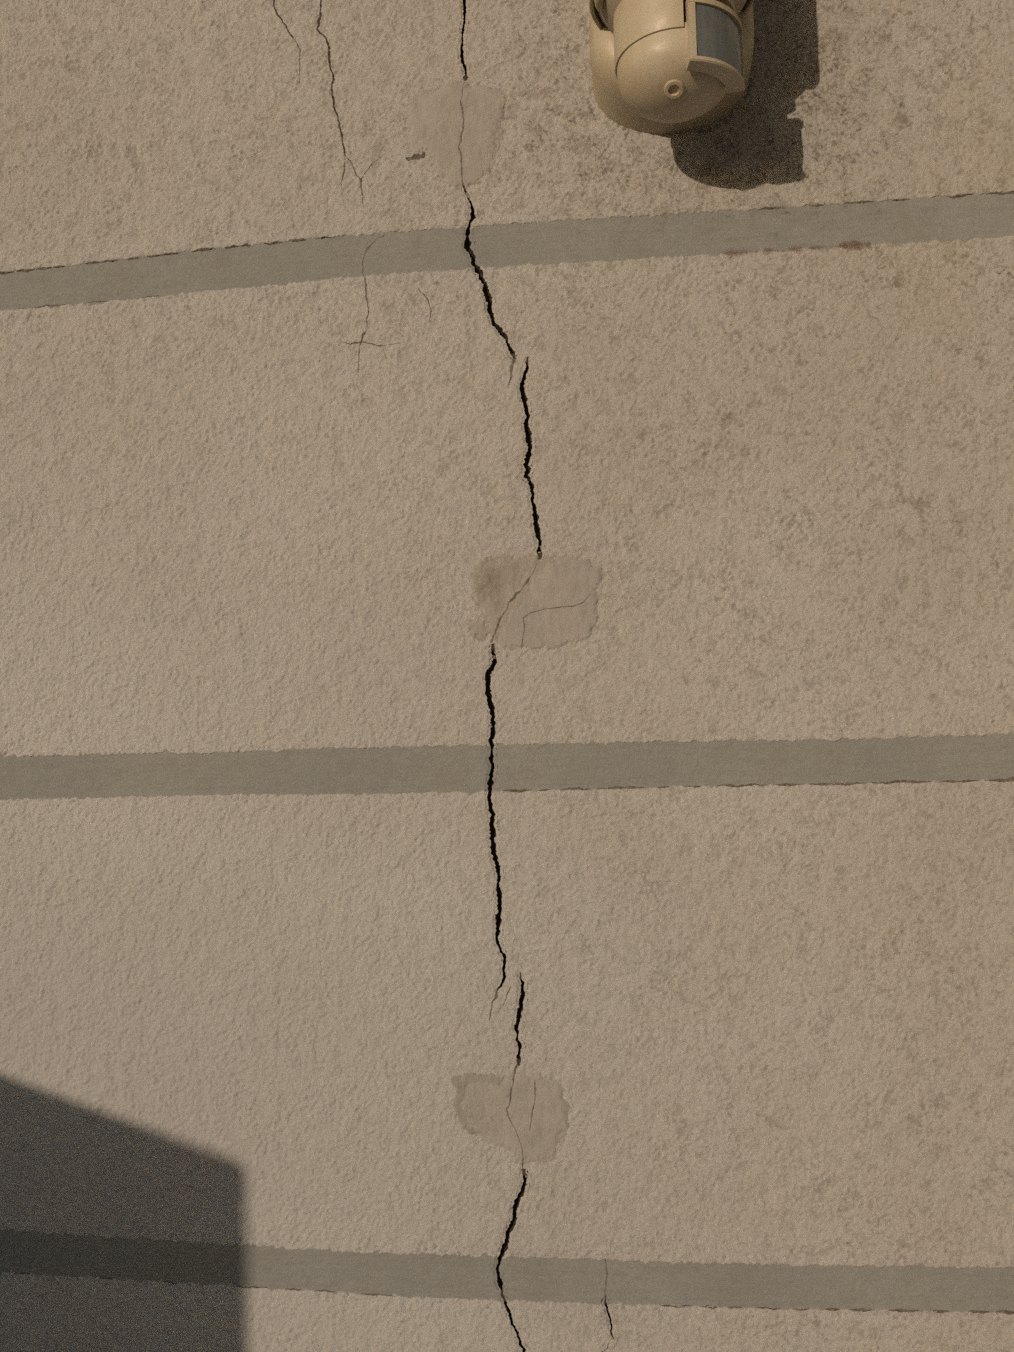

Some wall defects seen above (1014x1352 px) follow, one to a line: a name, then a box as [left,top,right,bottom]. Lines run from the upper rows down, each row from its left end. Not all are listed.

crack [273,0,378,203]
crack [340,235,396,366]
crack [457,0,590,1352]